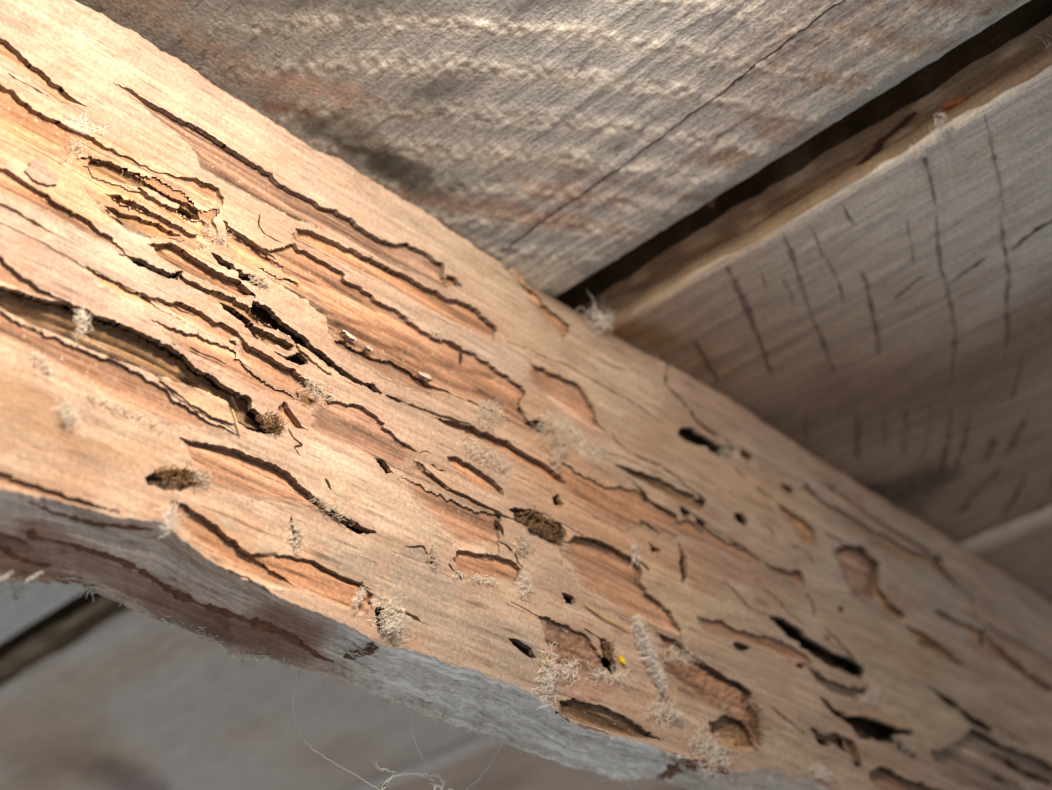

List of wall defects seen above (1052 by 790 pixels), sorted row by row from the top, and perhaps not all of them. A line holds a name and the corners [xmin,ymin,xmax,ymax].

crack [501,0,845,253]
crack [855,112,916,166]
peeling [132,186,199,237]
crack [893,220,1052,300]
peeling [293,344,332,374]
peeling [411,370,433,382]
peeling [159,379,234,425]
peeling [840,708,911,730]